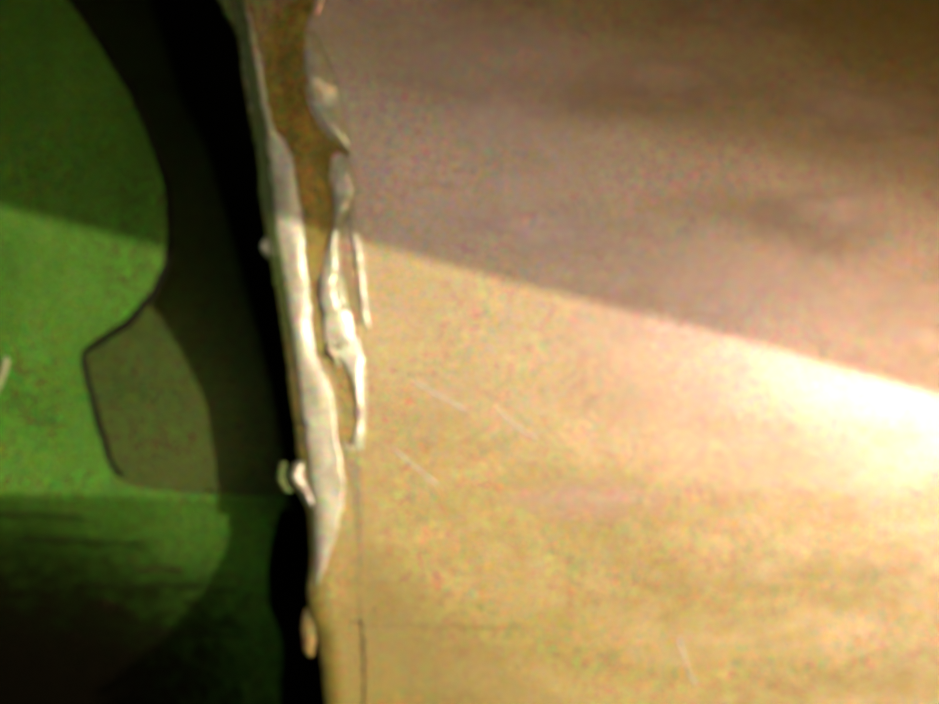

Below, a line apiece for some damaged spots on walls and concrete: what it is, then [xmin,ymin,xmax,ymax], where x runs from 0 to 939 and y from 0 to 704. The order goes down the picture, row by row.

peeling [218,0,370,591]
spalling [301,607,317,657]
crack [359,618,367,704]